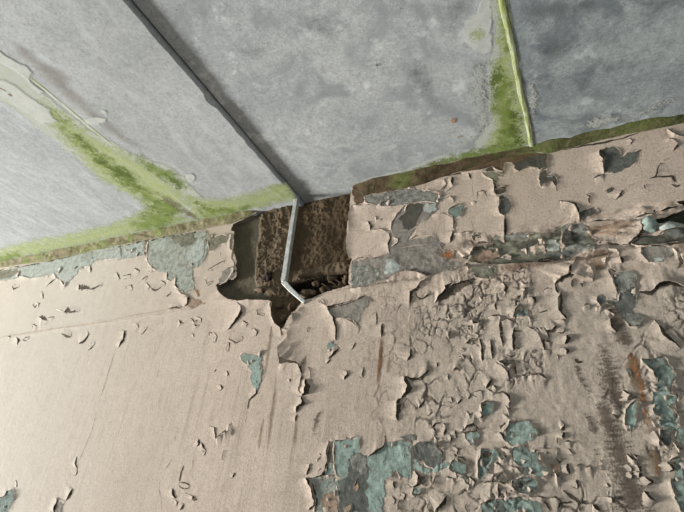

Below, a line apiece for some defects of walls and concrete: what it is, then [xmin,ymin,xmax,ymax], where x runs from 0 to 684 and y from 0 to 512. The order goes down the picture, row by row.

leakage [413,12,541,169]
leakage [0,102,293,262]
spalling [0,145,684,512]
rust [627,352,651,433]